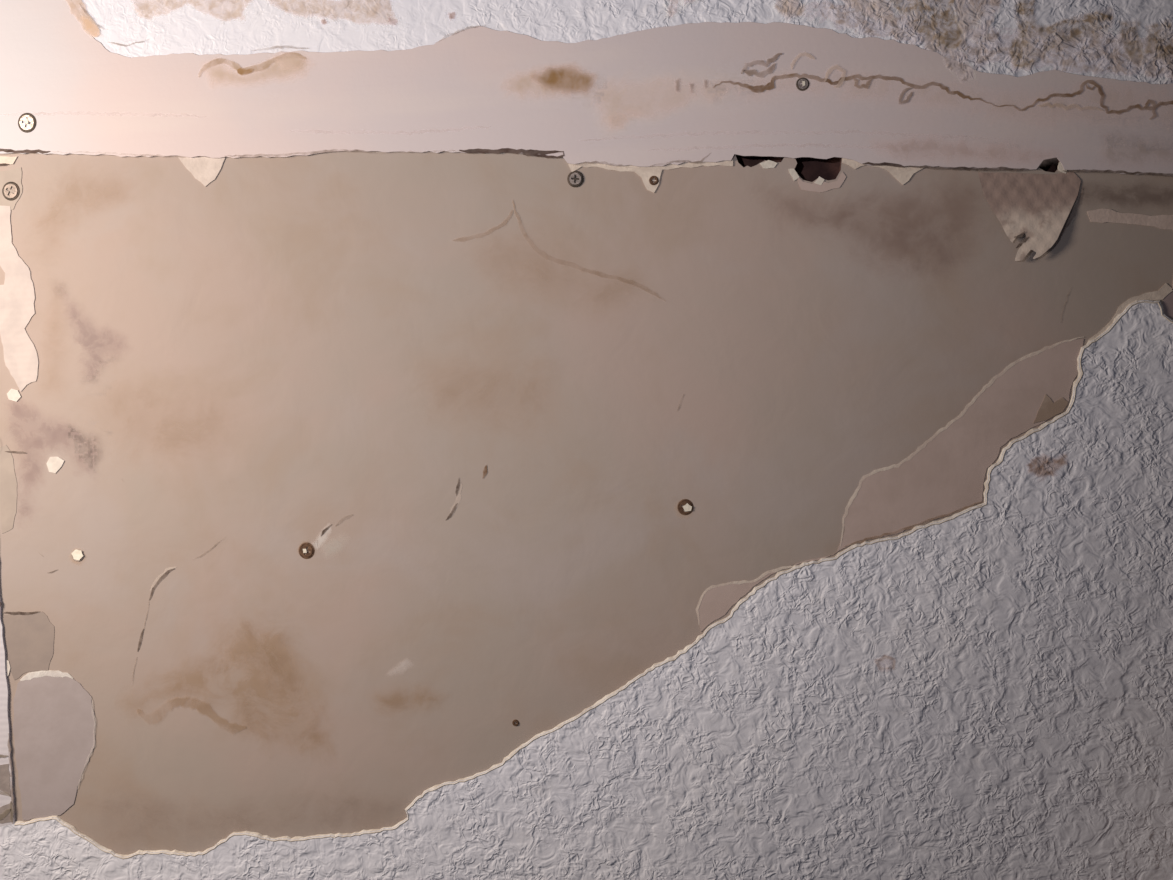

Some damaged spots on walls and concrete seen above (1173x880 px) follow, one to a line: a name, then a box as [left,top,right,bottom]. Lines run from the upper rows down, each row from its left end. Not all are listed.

damp [135,0,251,21]
damp [270,0,396,24]
damp [775,0,1173,82]
peeling [568,158,733,193]
spalling [736,155,783,169]
spalling [789,157,842,185]
peeling [978,172,1081,261]
spalling [1039,158,1070,174]
peeling [0,206,39,391]
peeling [3,283,1173,859]
crack [136,568,175,659]
damp [172,630,292,731]